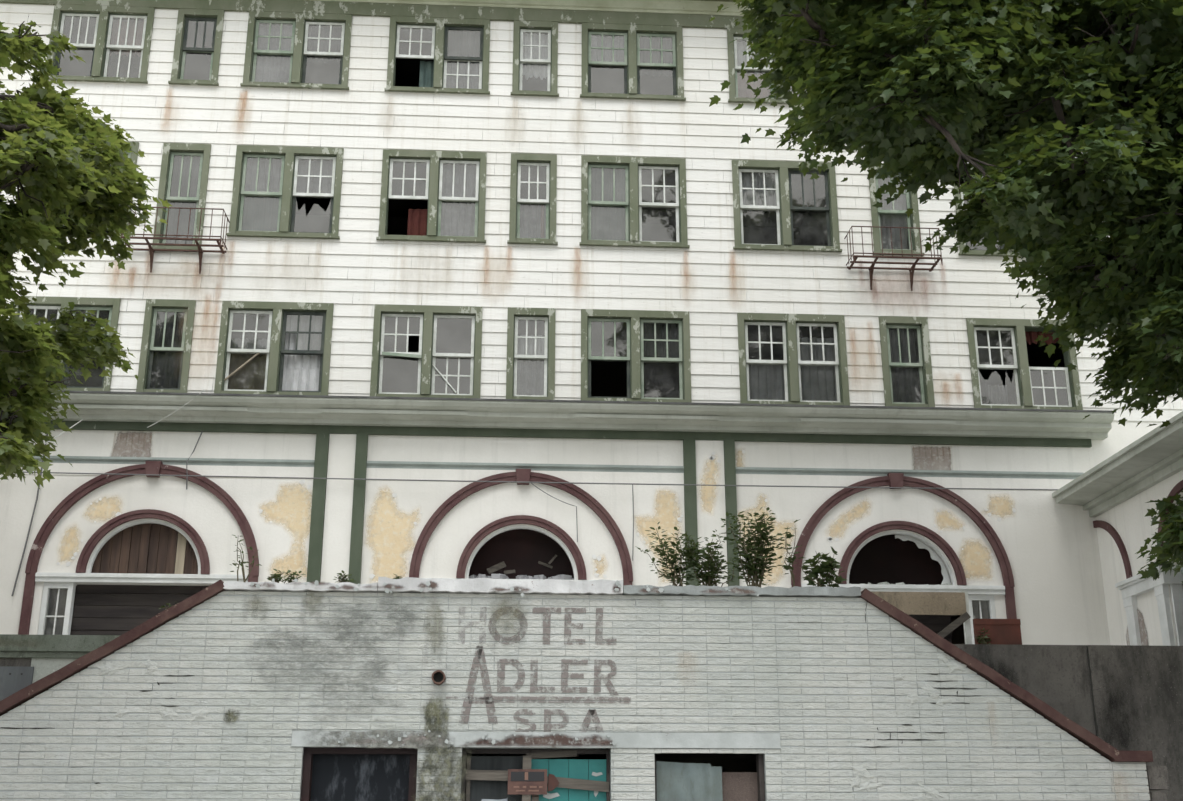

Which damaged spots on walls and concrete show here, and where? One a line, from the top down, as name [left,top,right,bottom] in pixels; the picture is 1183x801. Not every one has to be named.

peeling [57,528,83,567]
peeling [87,498,121,523]
peeling [250,480,422,593]
peeling [636,491,684,593]
peeling [827,497,868,542]
peeling [934,509,994,580]
peeling [979,497,1016,521]
spalling [419,581,438,592]